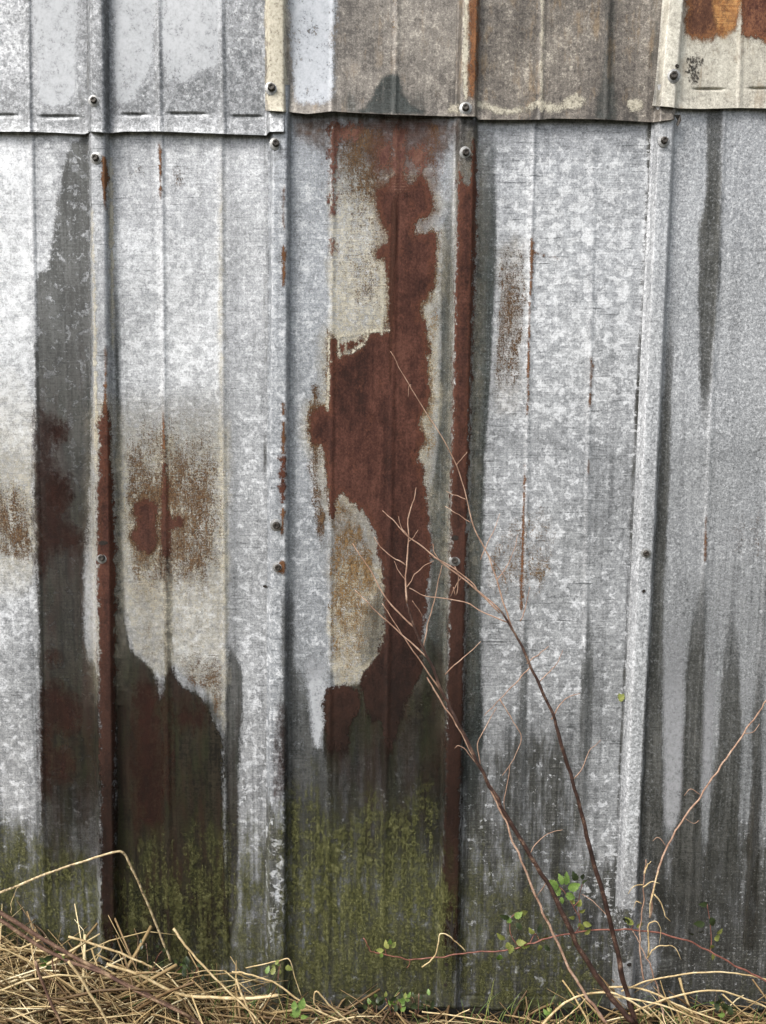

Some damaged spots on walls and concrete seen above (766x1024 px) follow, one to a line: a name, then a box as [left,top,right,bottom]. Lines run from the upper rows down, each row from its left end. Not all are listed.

water stain [33,138,243,947]
rust [91,352,230,963]
rust [297,118,455,759]
rust [440,139,479,971]
water stain [638,366,762,934]
water stain [698,109,722,398]
rust [682,0,766,43]